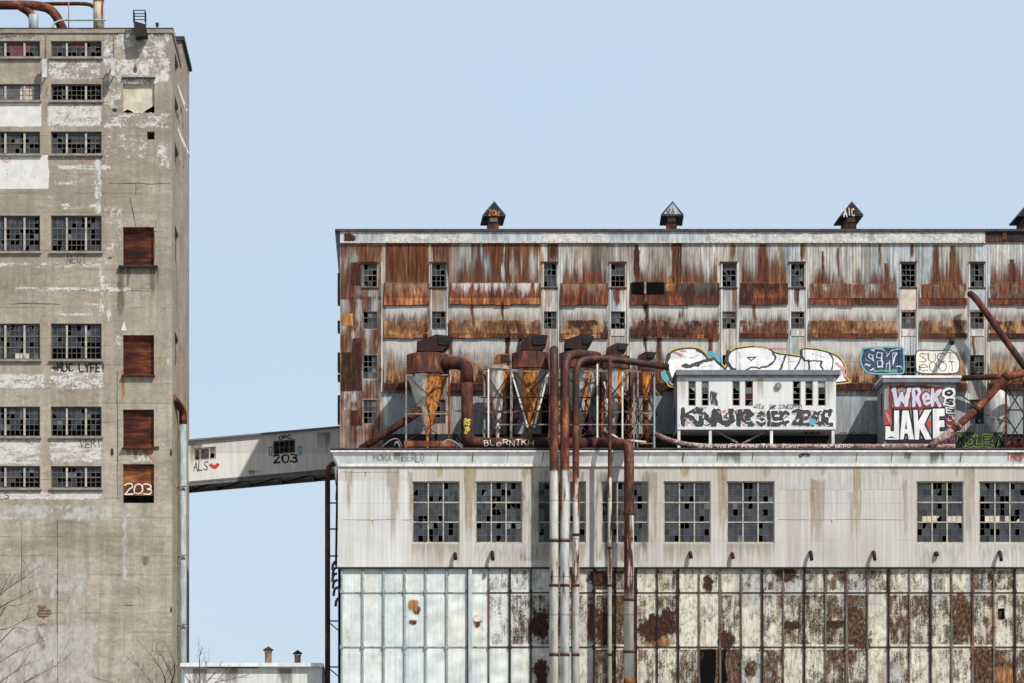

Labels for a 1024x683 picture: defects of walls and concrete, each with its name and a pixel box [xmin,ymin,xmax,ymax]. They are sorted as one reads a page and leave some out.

peeling [0,33,170,321]
peeling [0,368,104,390]
rust [340,233,619,442]
rust [630,302,719,390]
rust [634,243,717,292]
rust [733,244,898,337]
rust [921,245,967,298]
rust [989,259,1024,337]
peeling [0,439,114,465]
rust [579,569,624,683]
rust [637,570,698,683]
rust [700,569,802,683]